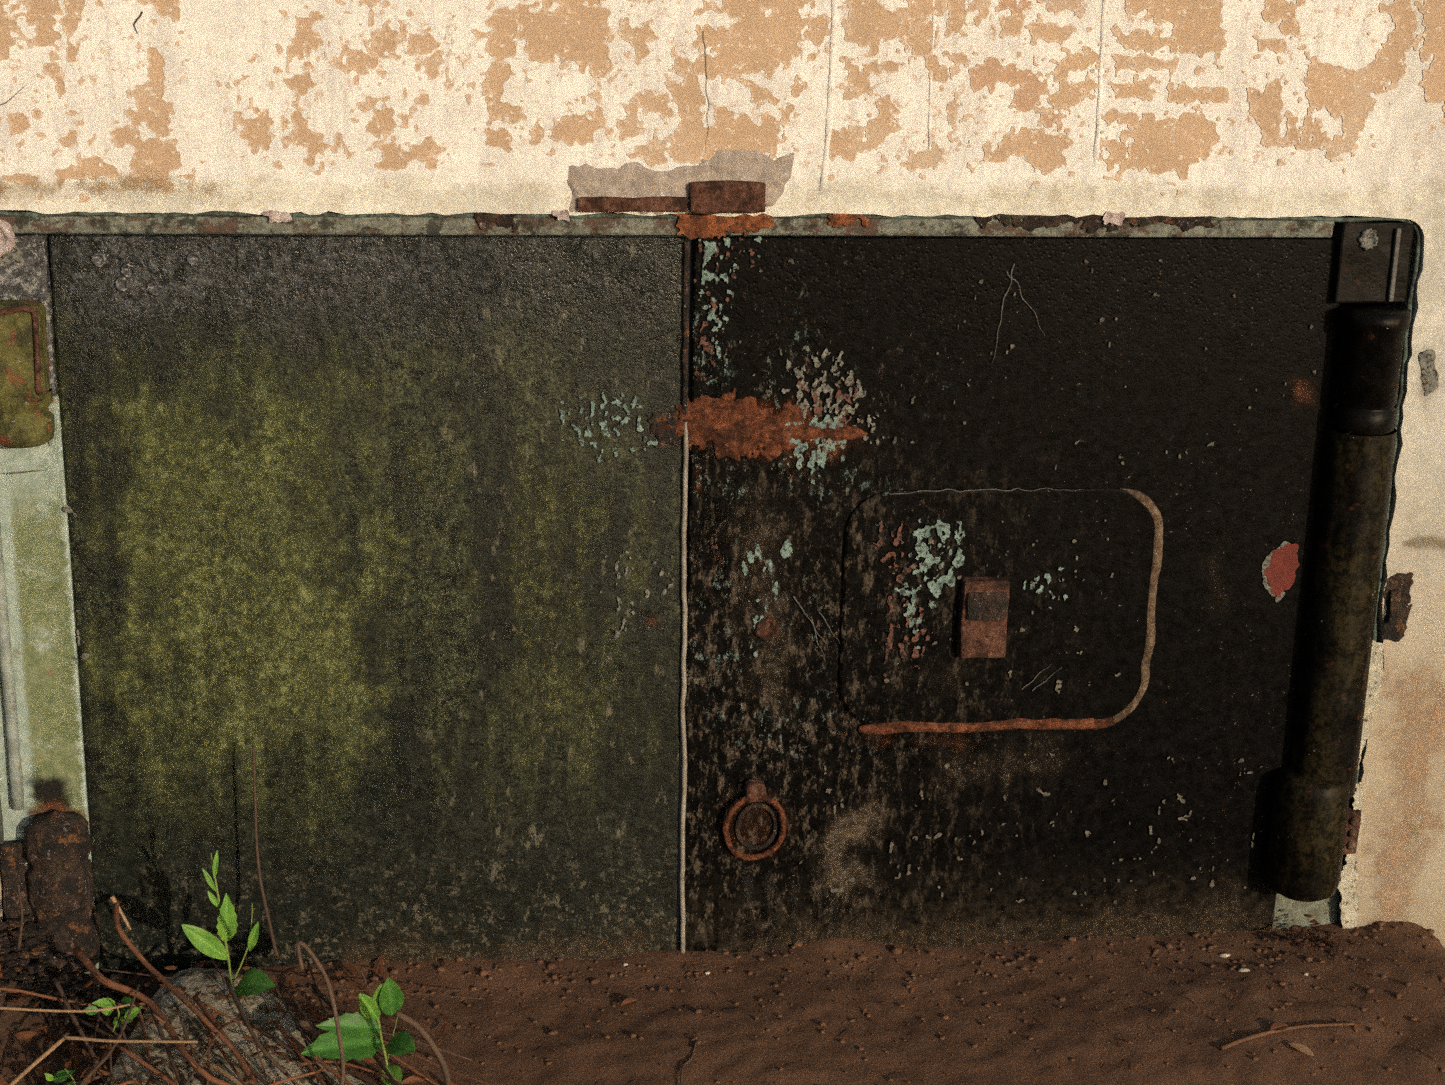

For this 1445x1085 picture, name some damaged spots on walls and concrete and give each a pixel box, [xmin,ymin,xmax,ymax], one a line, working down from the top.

peeling [0,0,208,202]
peeling [216,0,1445,223]
corrosion [673,213,775,239]
peeling [694,236,763,390]
peeling [765,341,915,484]
peeling [860,519,965,686]
peeling [1023,539,1085,614]